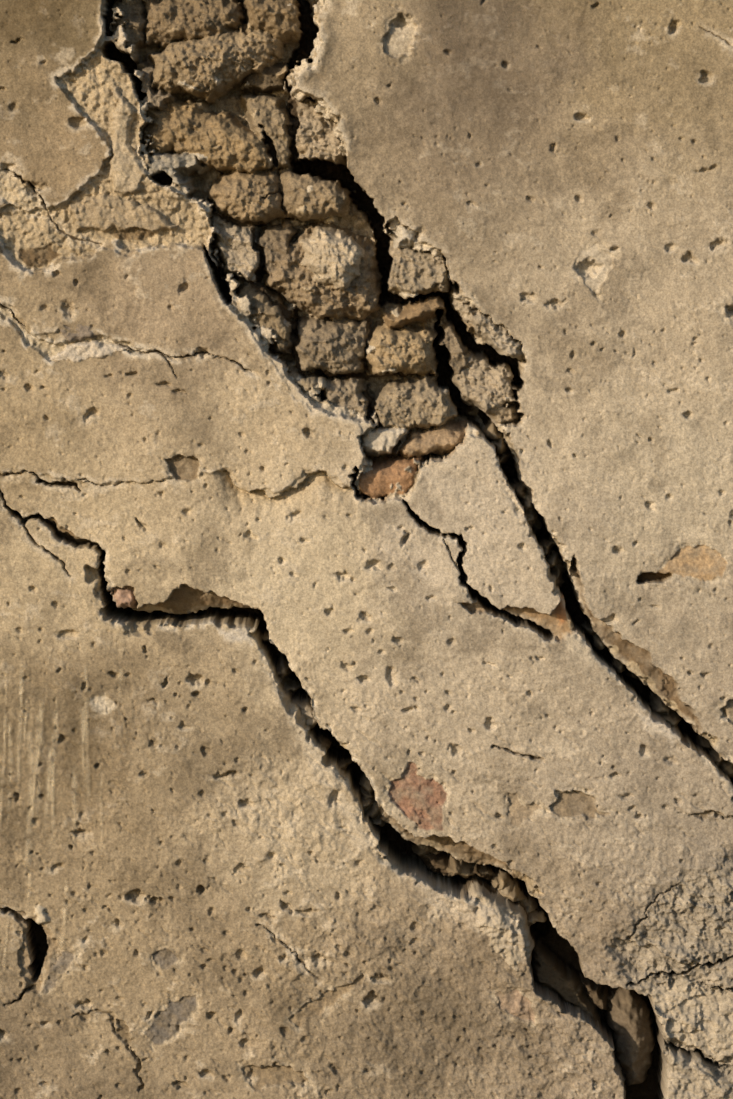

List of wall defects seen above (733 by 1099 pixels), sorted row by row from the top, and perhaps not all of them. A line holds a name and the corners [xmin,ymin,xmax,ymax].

crack [700,27,733,49]
crack [0,168,104,246]
crack [203,246,232,306]
spalling [0,0,528,507]
crack [0,303,27,328]
crack [104,342,256,379]
spalling [637,544,729,584]
crack [402,404,733,823]
crack [0,470,668,1099]
spalling [389,762,448,832]
crack [625,884,680,944]